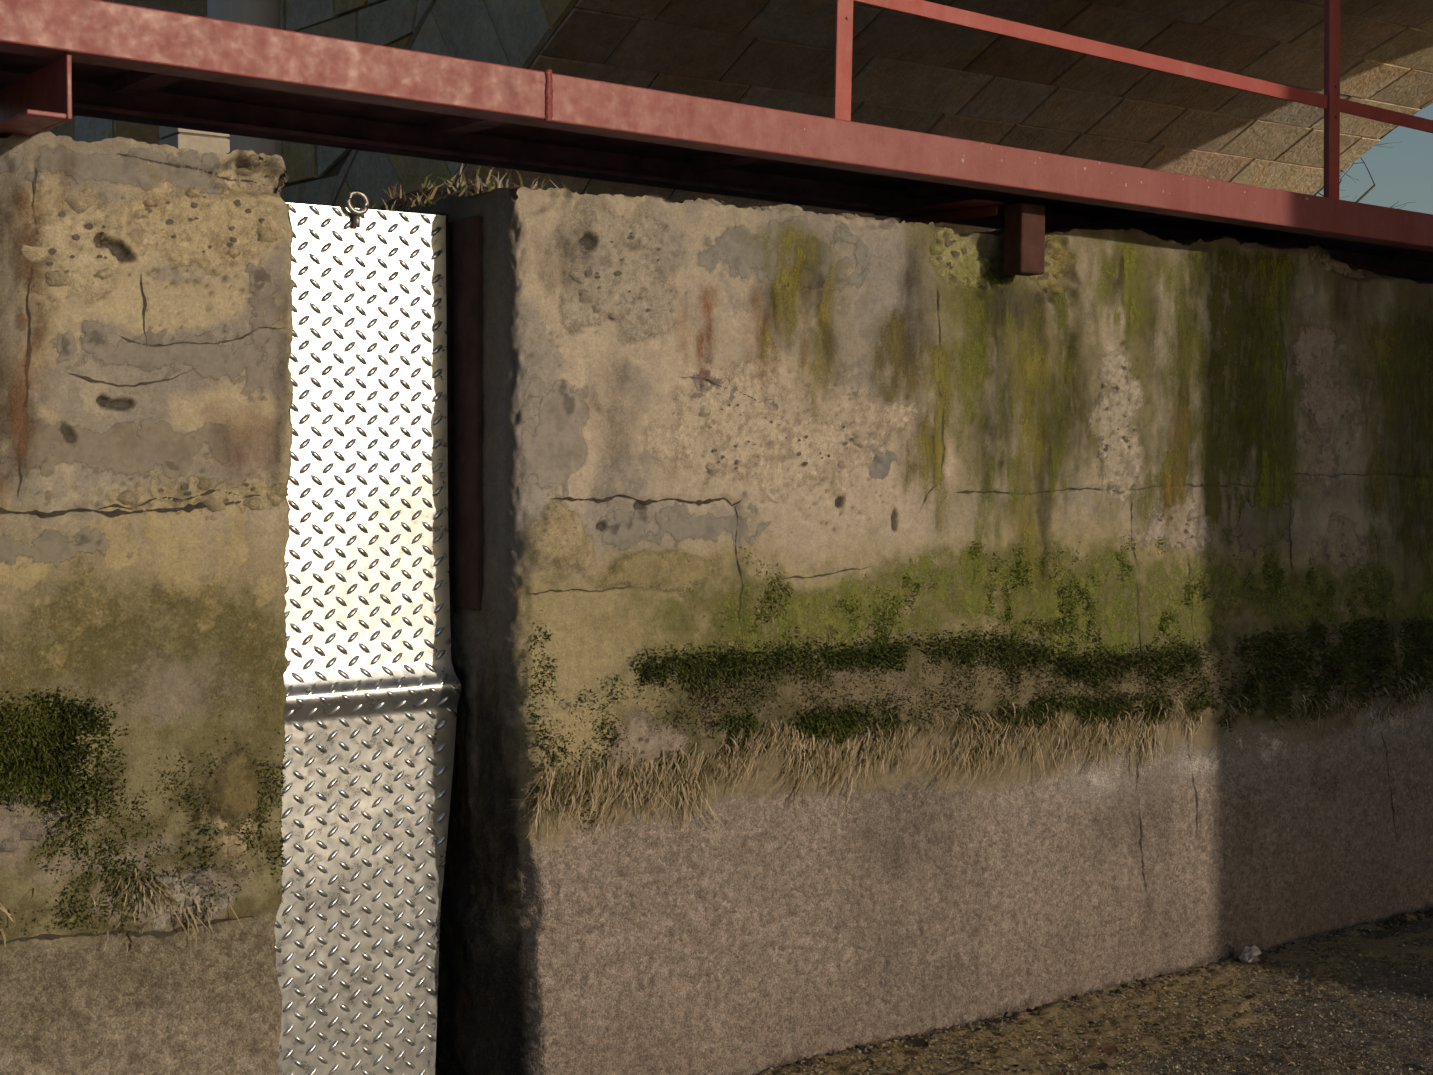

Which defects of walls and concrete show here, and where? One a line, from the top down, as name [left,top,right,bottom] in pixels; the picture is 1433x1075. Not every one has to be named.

corrosion [8,313,43,462]
crack [24,163,38,404]
crack [0,441,261,518]
crack [67,274,286,387]
spalling [549,194,727,342]
spalling [1088,353,1144,502]
crack [527,586,631,595]
crack [552,495,744,637]
crack [784,566,870,579]
crack [919,258,1431,899]